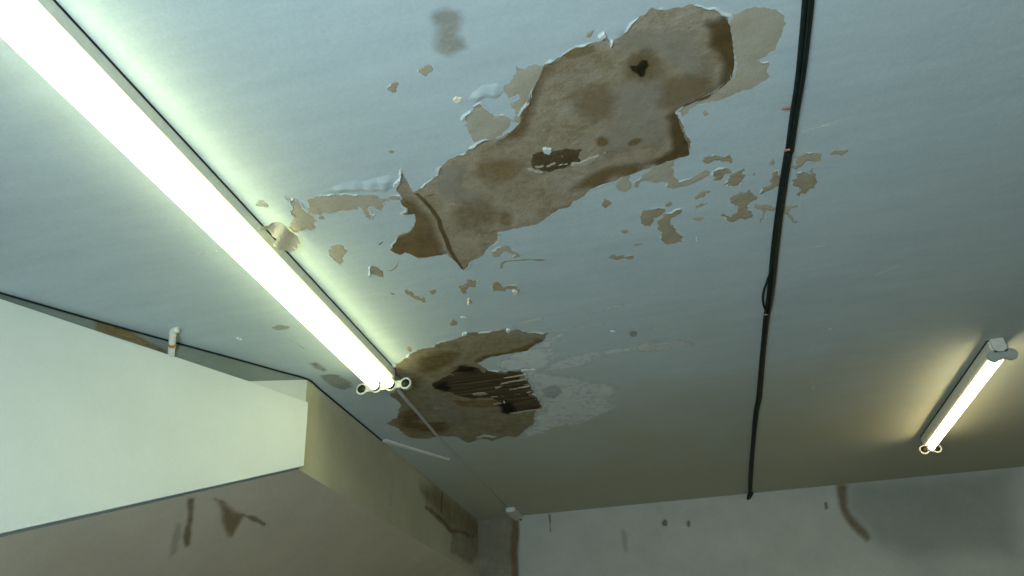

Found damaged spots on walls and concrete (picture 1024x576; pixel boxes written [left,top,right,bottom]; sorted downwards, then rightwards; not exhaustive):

peeling [257,4,848,443]
damp [500,304,692,436]
damp [185,499,193,544]
damp [224,507,263,532]
damp [839,486,867,538]